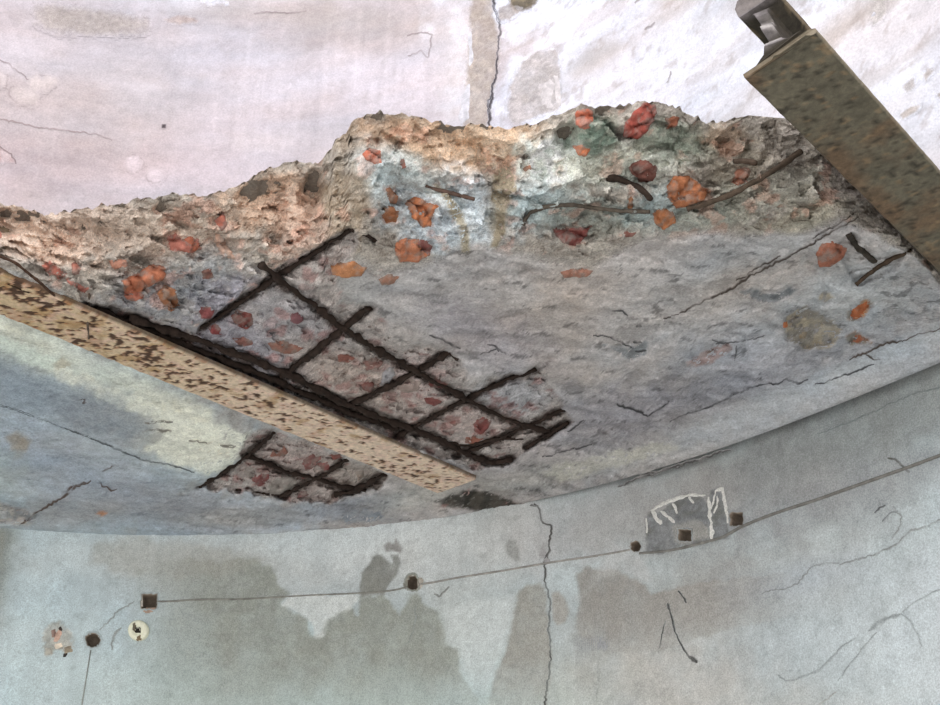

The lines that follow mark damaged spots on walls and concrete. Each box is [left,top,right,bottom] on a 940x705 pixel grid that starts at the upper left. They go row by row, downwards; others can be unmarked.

crack [486,0,507,126]
spalling [0,0,940,471]
crack [593,213,859,353]
damp [0,353,168,449]
crack [617,328,940,422]
damp [0,528,25,633]
crack [0,404,195,526]
spalling [198,429,386,526]
damp [80,535,814,705]
spalling [432,486,525,513]
crack [530,503,553,705]
flaking render [628,486,746,555]